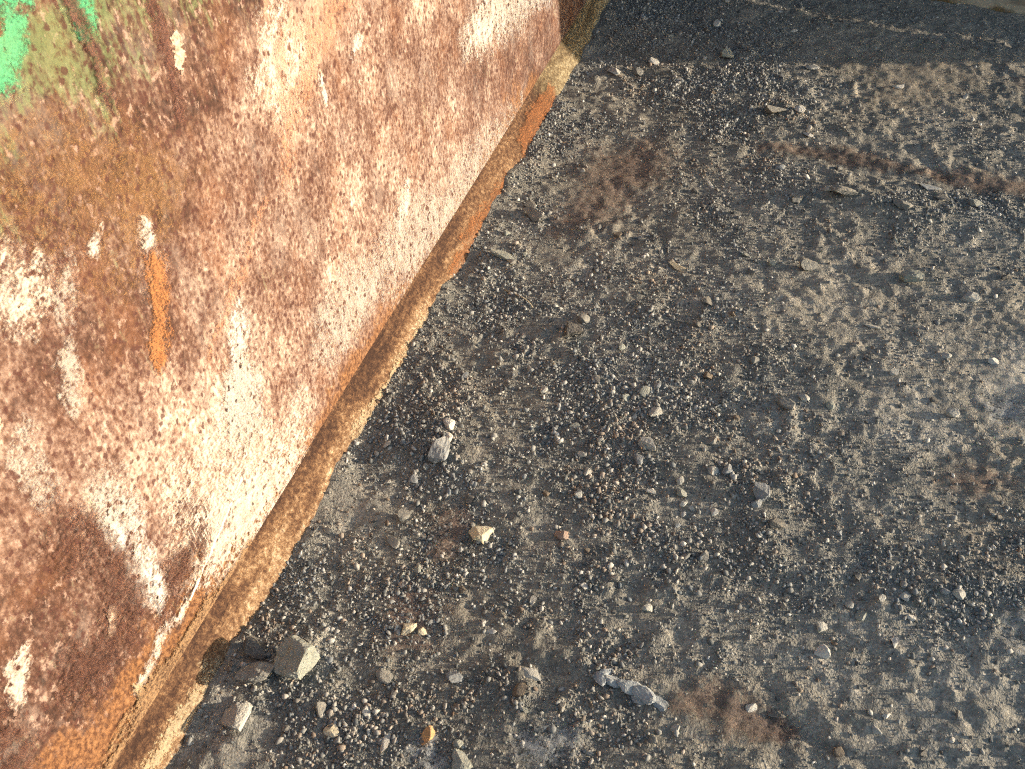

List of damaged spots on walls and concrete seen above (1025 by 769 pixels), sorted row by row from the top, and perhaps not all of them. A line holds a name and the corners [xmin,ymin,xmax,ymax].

peeling [0,0,35,96]
peeling [69,0,99,42]
corrosion [517,83,555,155]
corrosion [449,173,506,275]
corrosion [559,142,666,224]
corrosion [144,251,173,375]
corrosion [41,486,145,715]
corrosion [99,539,252,769]
corrosion [159,486,213,620]
corrosion [388,592,428,648]
corrosion [0,698,44,769]